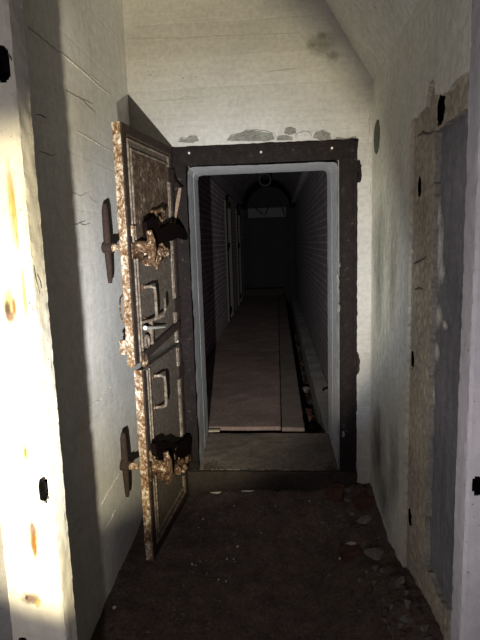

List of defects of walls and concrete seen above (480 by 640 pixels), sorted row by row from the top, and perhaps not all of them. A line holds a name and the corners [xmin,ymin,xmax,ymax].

flaking render [227,127,359,142]
corrosion [5,297,15,321]